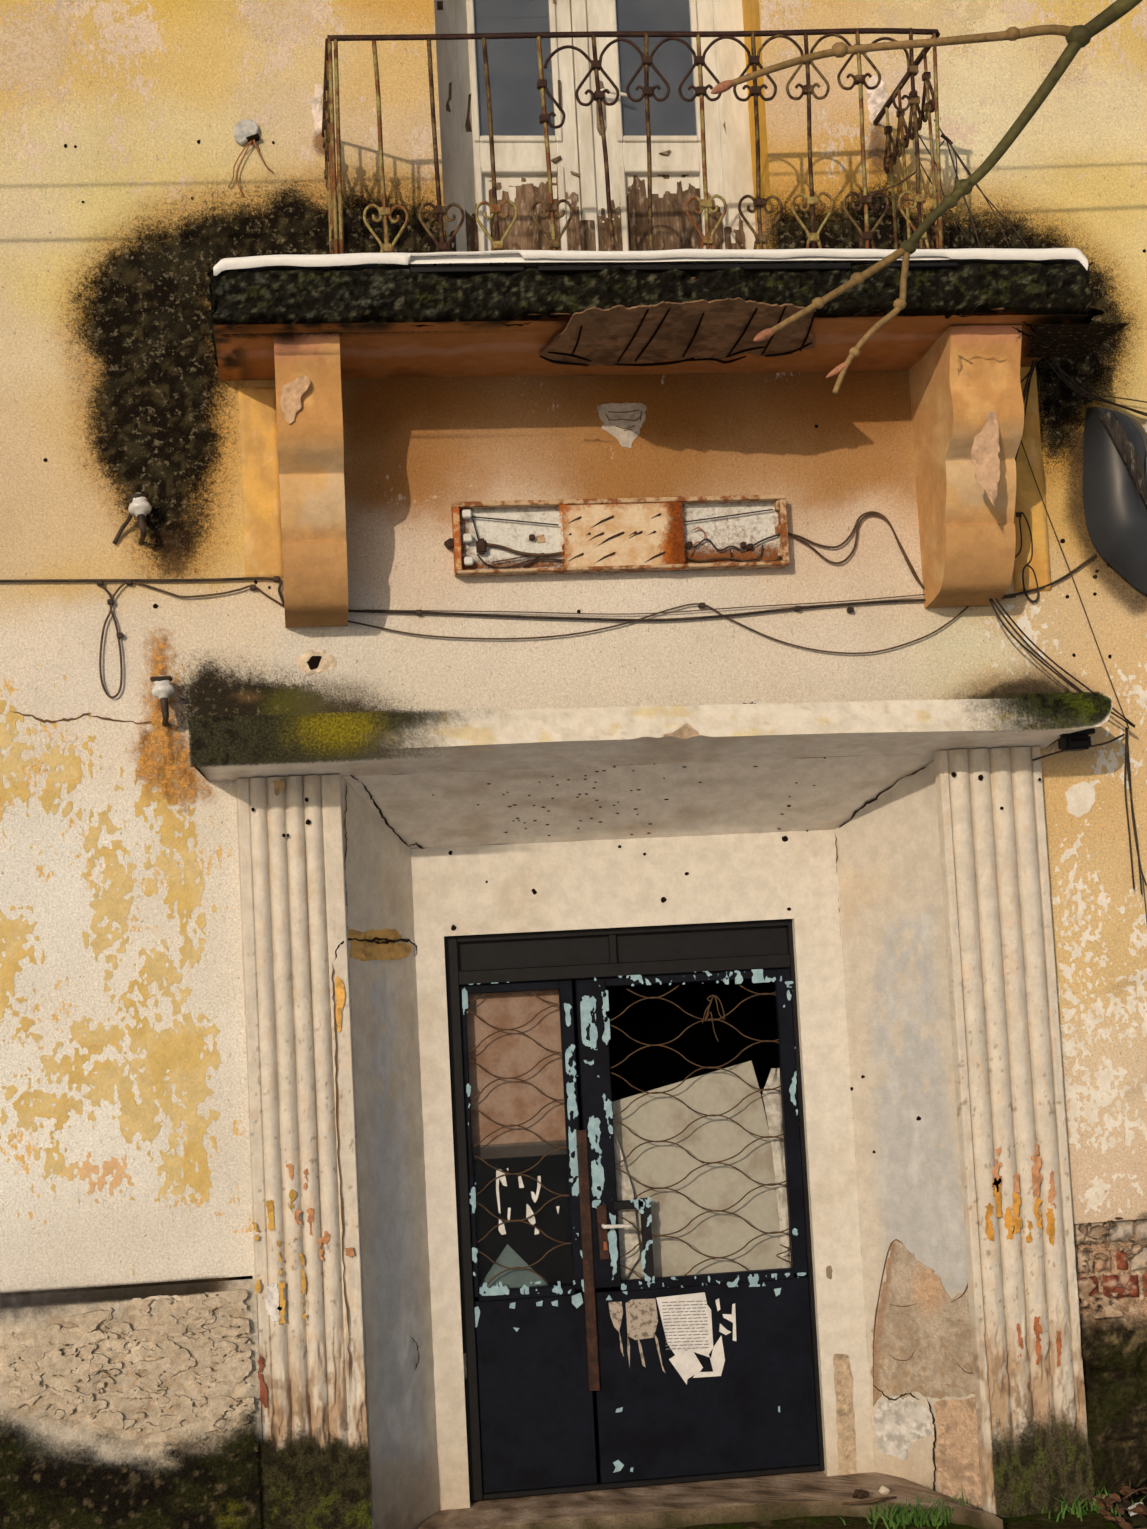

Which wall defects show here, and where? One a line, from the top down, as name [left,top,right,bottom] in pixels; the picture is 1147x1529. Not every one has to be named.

water stain [66,177,524,583]
water stain [762,168,1136,472]
peeling [971,411,1000,506]
rust [135,629,211,812]
water stain [172,656,413,731]
peeling [972,592,1064,676]
water stain [967,675,1071,699]
peeling [0,700,229,1210]
crack [331,775,424,1379]
peeling [1054,640,1147,1301]
spalling [833,1239,983,1508]
peeling [1017,1316,1062,1367]